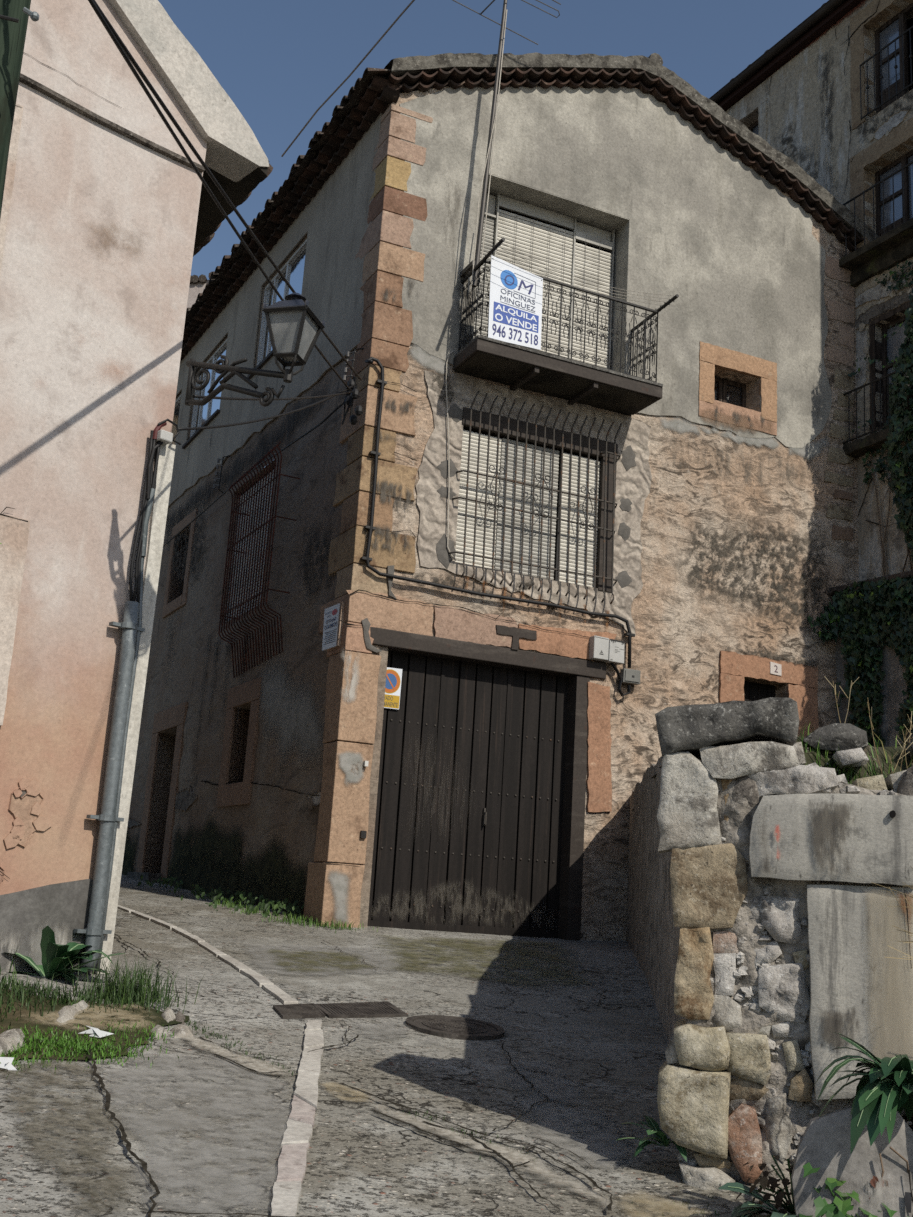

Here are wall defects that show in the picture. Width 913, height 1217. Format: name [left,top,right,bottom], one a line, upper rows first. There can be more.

water stain [781,132,831,179]
crack [199,1015,407,1072]
crack [87,1049,336,1217]
crack [340,1043,613,1217]